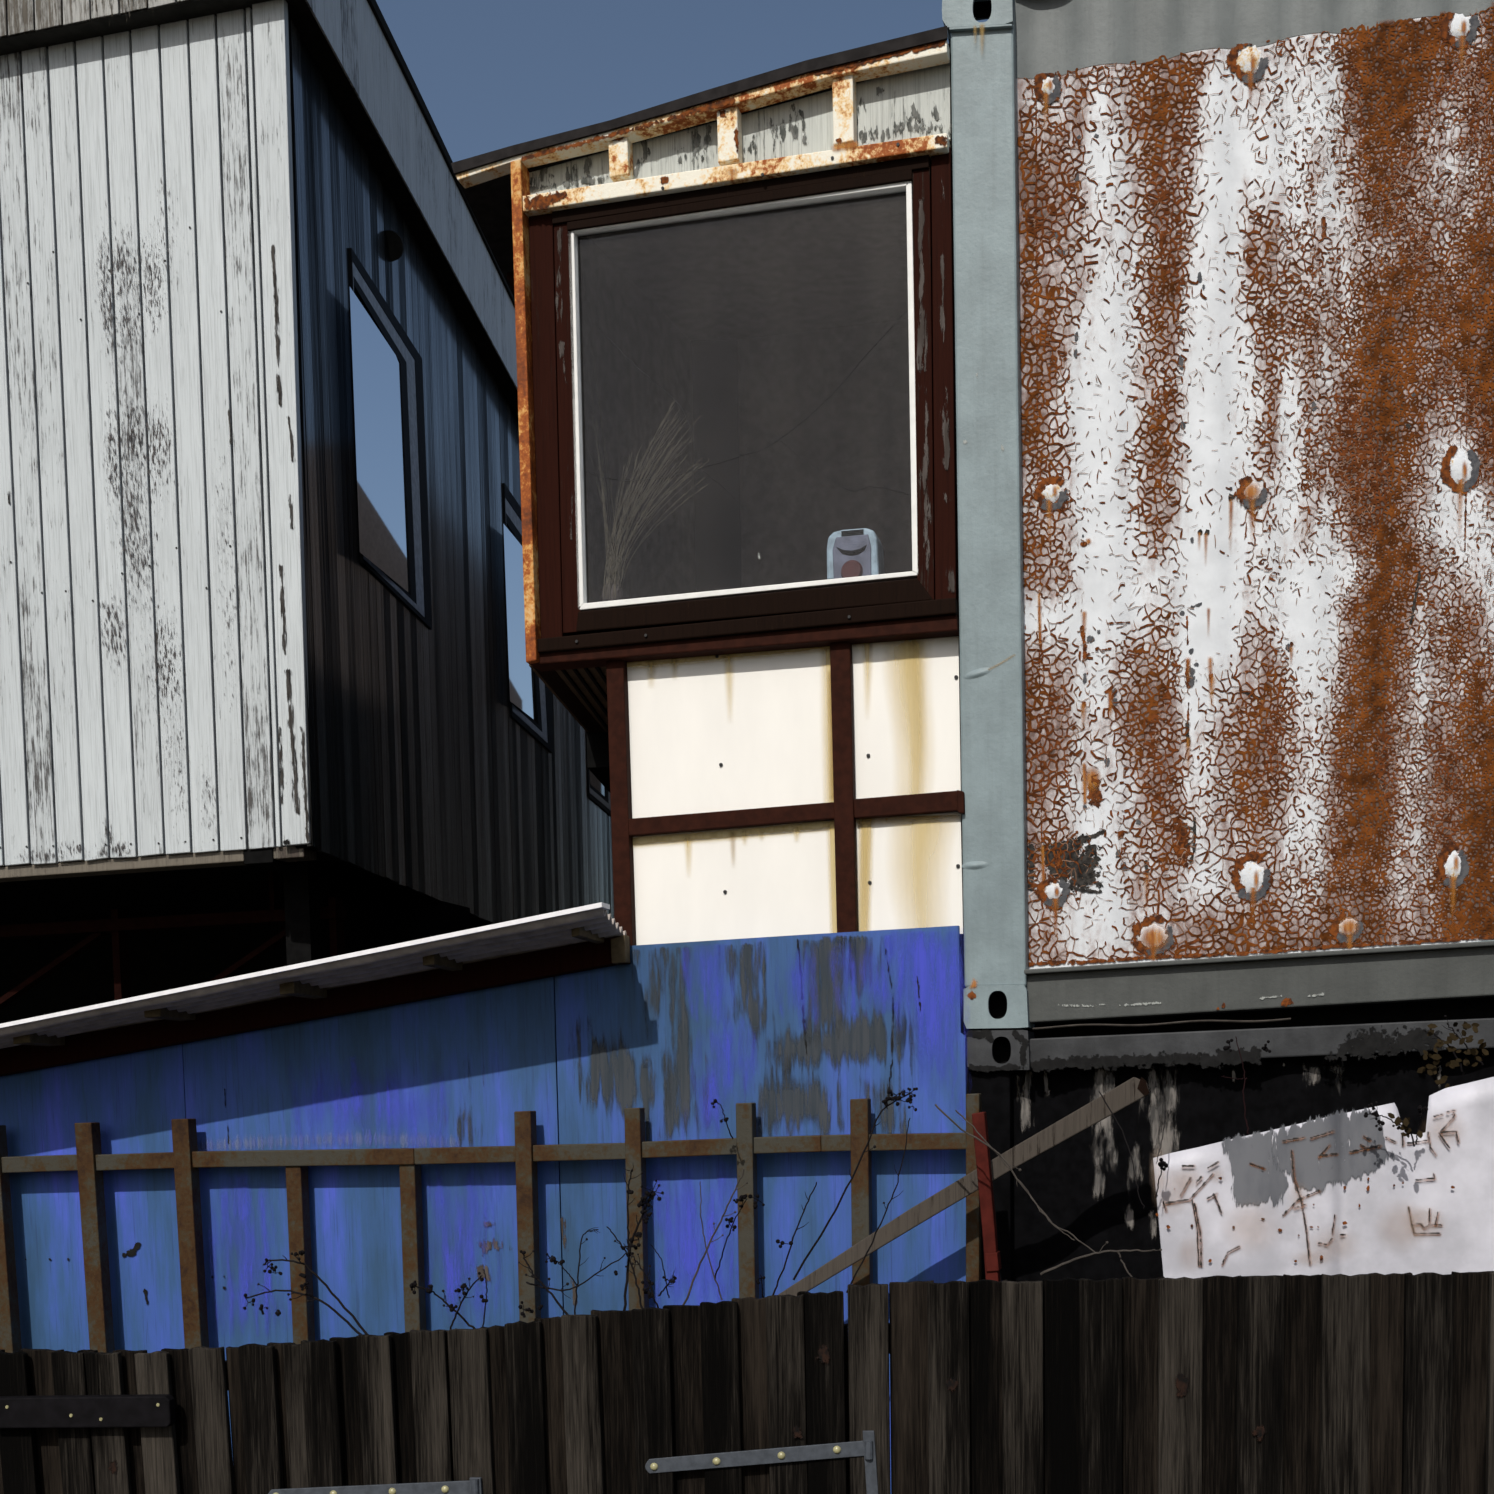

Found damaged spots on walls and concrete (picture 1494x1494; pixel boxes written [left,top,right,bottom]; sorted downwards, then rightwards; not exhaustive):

rust [814,40,946,75]
peeling [856,87,951,144]
rust [523,190,567,210]
rust [1018,104,1083,488]
rust [1024,12,1494,967]
water stain [627,646,834,802]
water stain [899,641,919,769]
water stain [633,821,837,933]
water stain [857,815,954,931]
peeling [1027,818,1141,894]
peeling [576,947,731,1141]
peeling [708,933,959,1137]